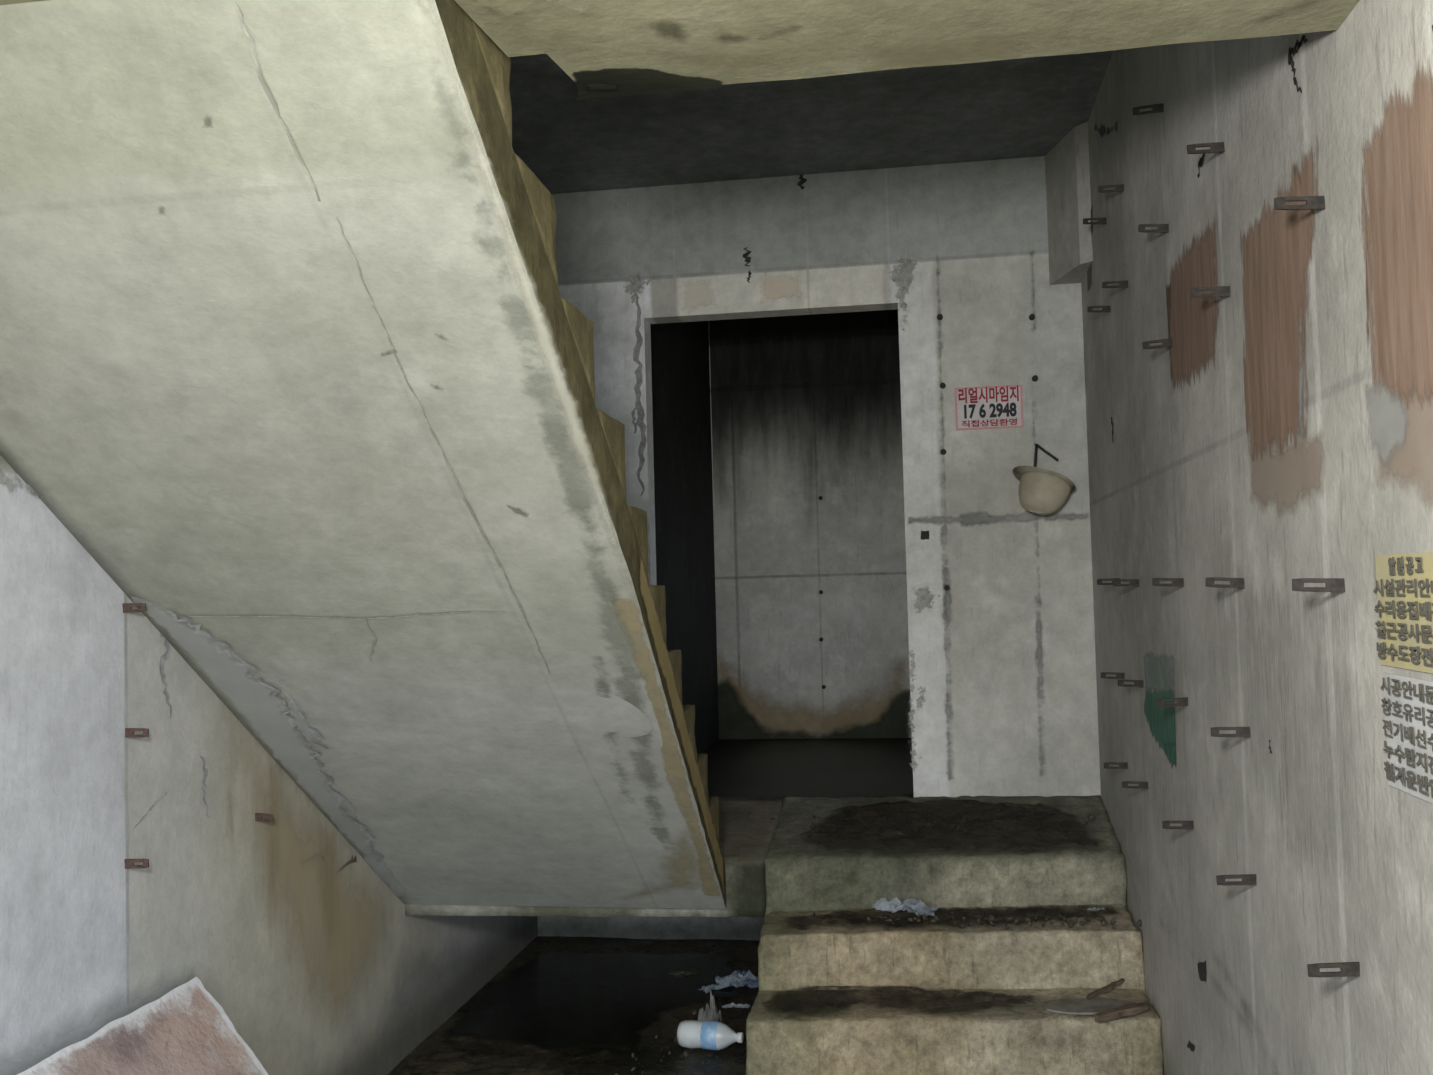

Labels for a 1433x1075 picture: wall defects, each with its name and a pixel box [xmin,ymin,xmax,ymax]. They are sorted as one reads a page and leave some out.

crack [1288,35,1307,93]
crack [159,3,550,719]
peeling [1166,222,1218,388]
peeling [1240,145,1322,512]
peeling [1361,67,1433,499]
leakage [530,375,591,530]
leakage [599,584,640,709]
leakage [718,664,911,739]
crack [200,756,209,817]